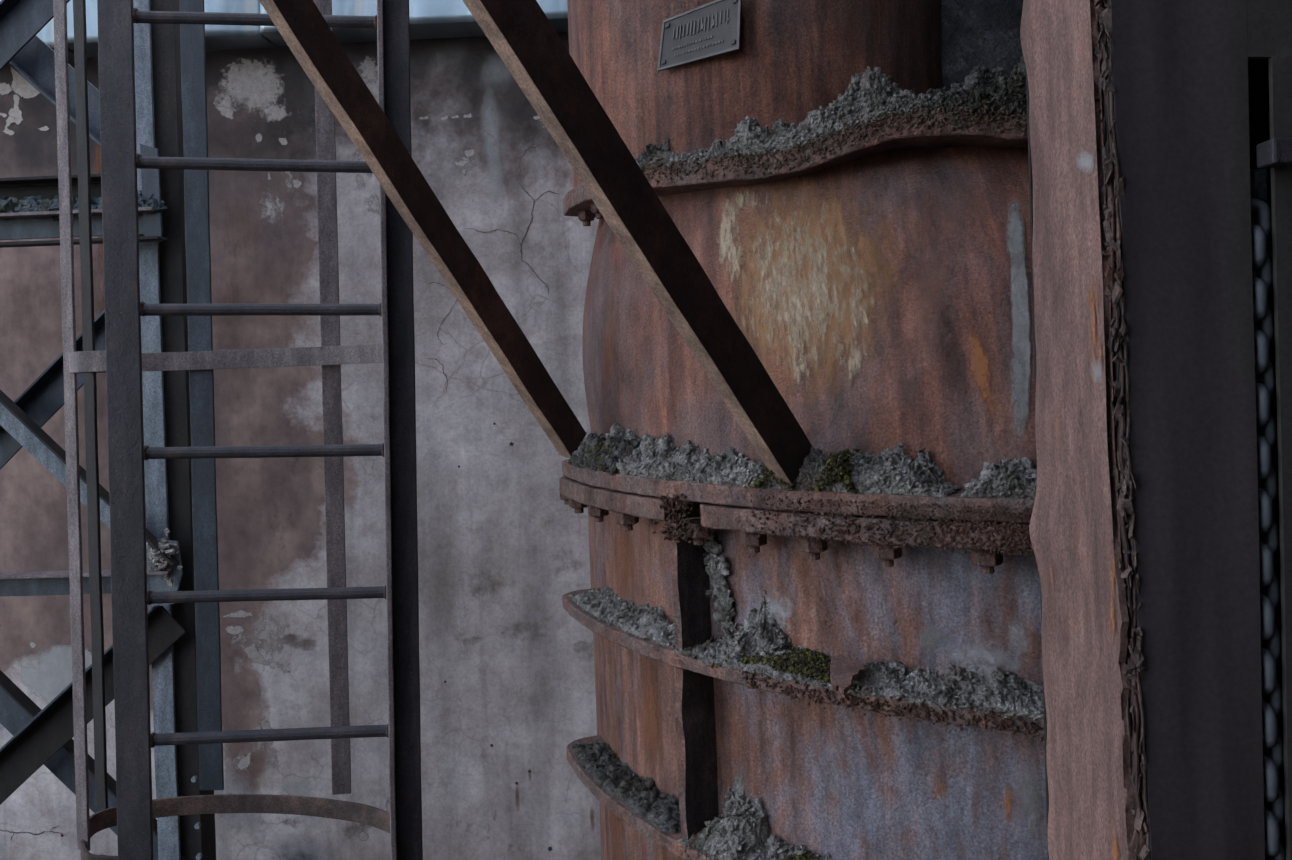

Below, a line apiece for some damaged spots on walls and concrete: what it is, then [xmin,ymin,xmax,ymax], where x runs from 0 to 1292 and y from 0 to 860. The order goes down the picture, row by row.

peeling [0,67,40,135]
peeling [214,57,288,142]
peeling [261,171,302,224]
crack [466,144,561,295]
crack [424,281,457,392]
rust [969,332,993,407]